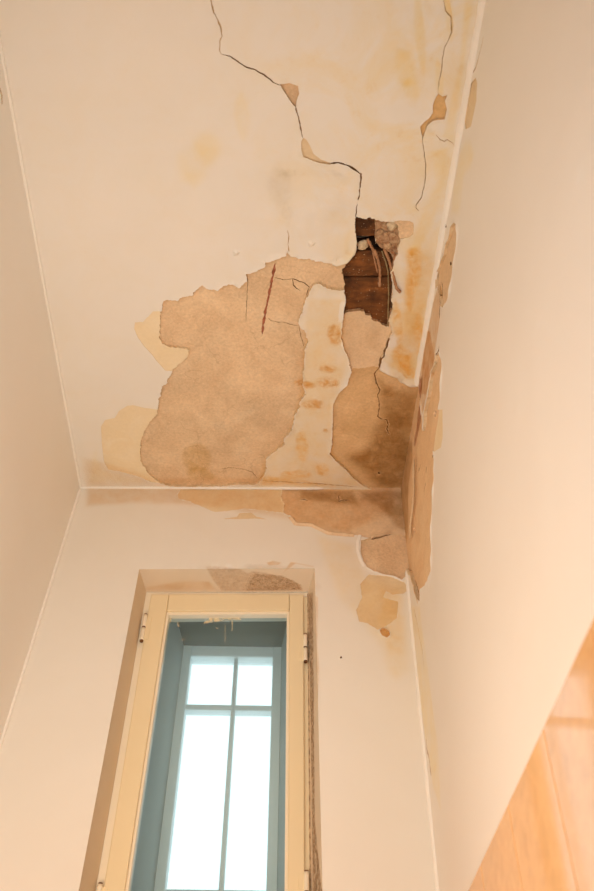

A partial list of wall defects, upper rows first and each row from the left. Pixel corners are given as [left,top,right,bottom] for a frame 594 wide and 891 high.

crack [211,0,279,85]
crack [438,0,452,87]
crack [331,162,362,217]
crack [416,135,454,211]
flaking render [435,223,456,307]
flaking render [101,220,443,637]